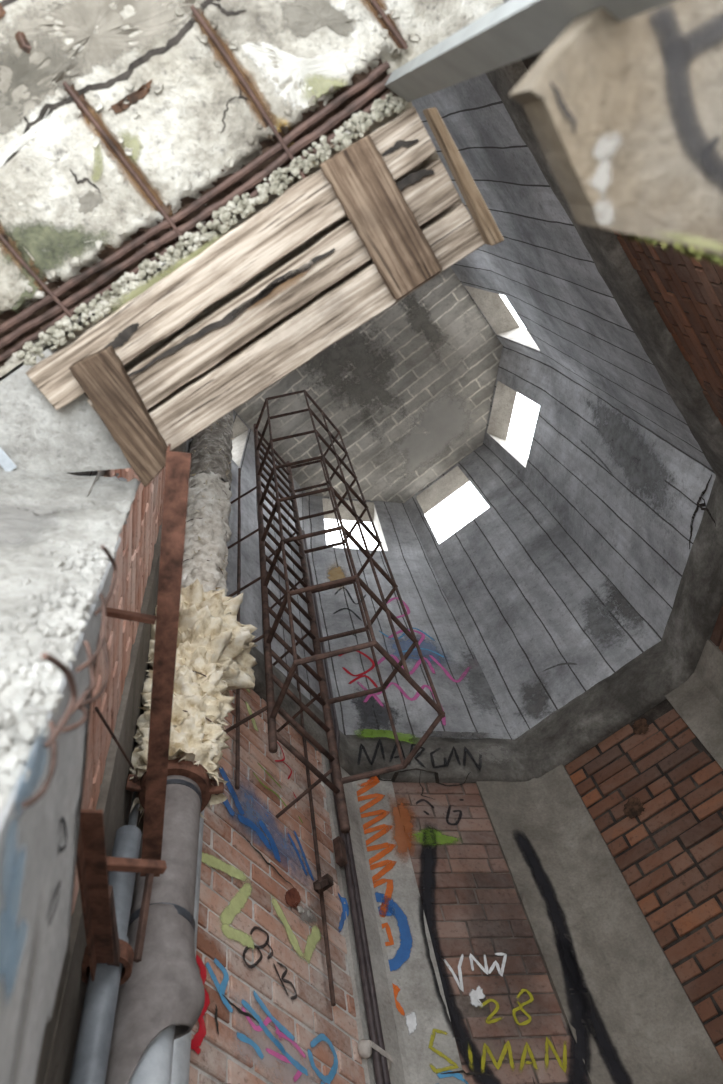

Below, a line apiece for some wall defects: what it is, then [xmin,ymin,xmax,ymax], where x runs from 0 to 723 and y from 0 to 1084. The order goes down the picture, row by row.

damp [0,35,85,108]
crack [0,0,246,168]
crack [218,71,255,133]
damp [283,0,354,37]
crack [69,169,101,193]
spalling [0,0,420,366]
damp [306,327,406,434]
spalling [0,539,116,785]